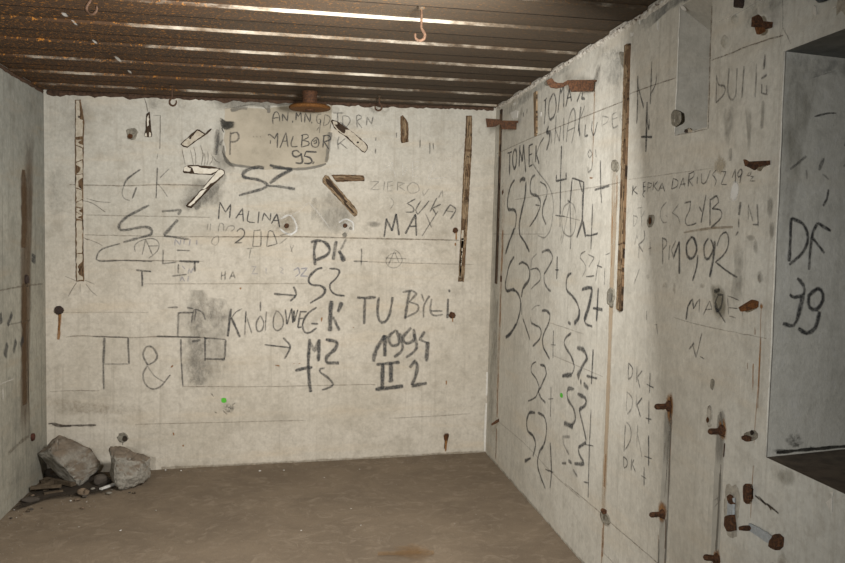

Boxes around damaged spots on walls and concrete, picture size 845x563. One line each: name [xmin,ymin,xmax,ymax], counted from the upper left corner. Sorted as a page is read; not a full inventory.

rust [752,318,761,420]